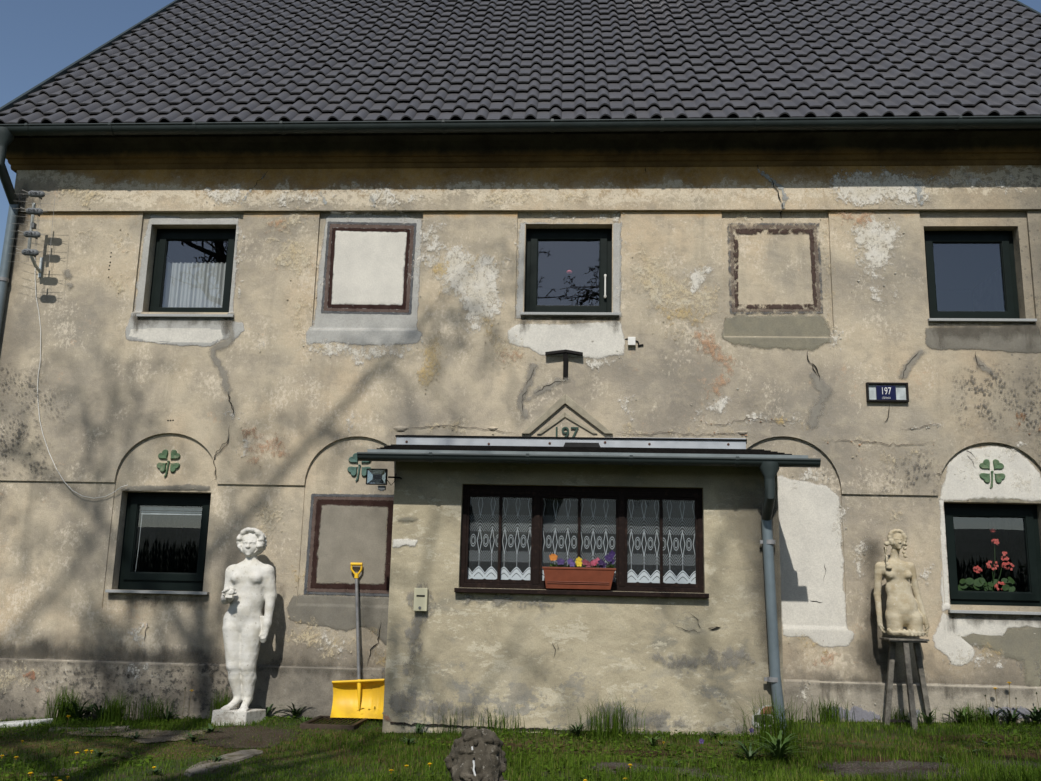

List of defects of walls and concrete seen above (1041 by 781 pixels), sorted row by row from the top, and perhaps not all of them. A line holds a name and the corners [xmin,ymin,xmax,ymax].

peeling [202,187,244,207]
peeling [269,191,318,231]
peeling [336,183,422,218]
crack [757,165,789,216]
peeling [408,220,536,367]
crack [210,320,235,480]
crack [406,363,568,434]
water stain [0,642,233,704]
peeling [283,616,360,658]
spalling [933,613,1041,687]